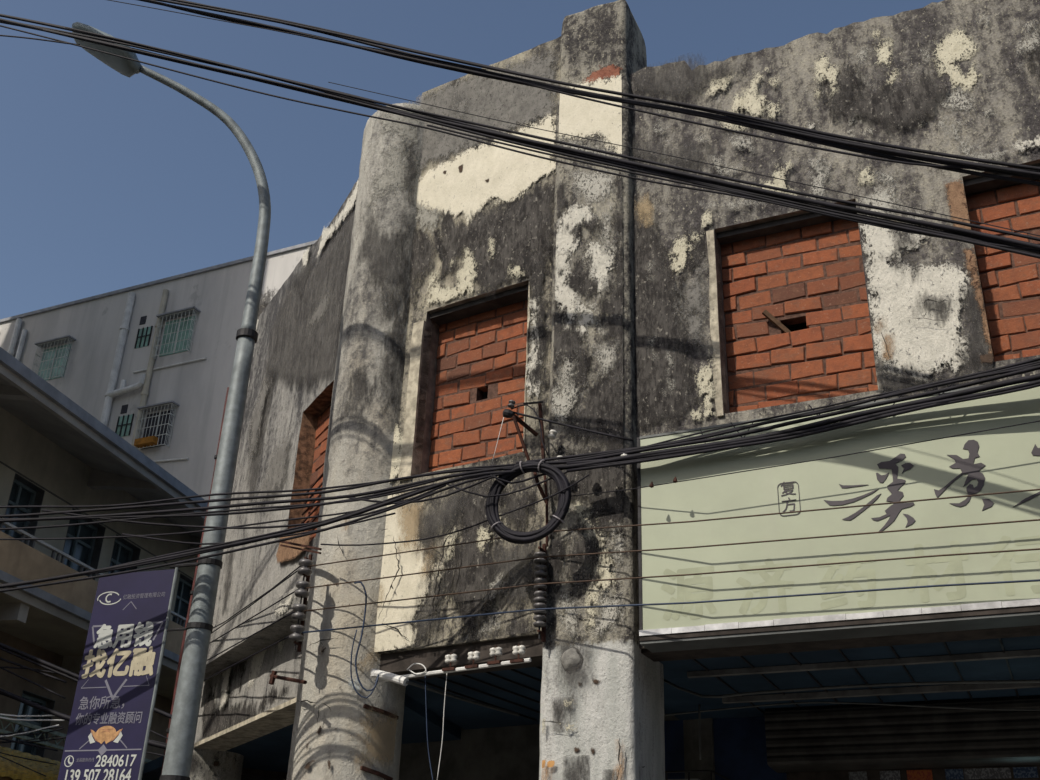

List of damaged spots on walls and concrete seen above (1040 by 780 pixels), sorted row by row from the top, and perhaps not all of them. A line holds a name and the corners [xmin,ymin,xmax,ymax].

water stain [819,63,949,131]
peeling [916,29,1040,163]
peeling [249,377,269,457]
peeling [253,428,290,507]
peeling [302,64,623,375]
water stain [248,47,709,594]
peeling [525,297,578,423]
peeling [855,164,994,383]
water stain [222,549,235,613]
water stain [415,481,535,641]